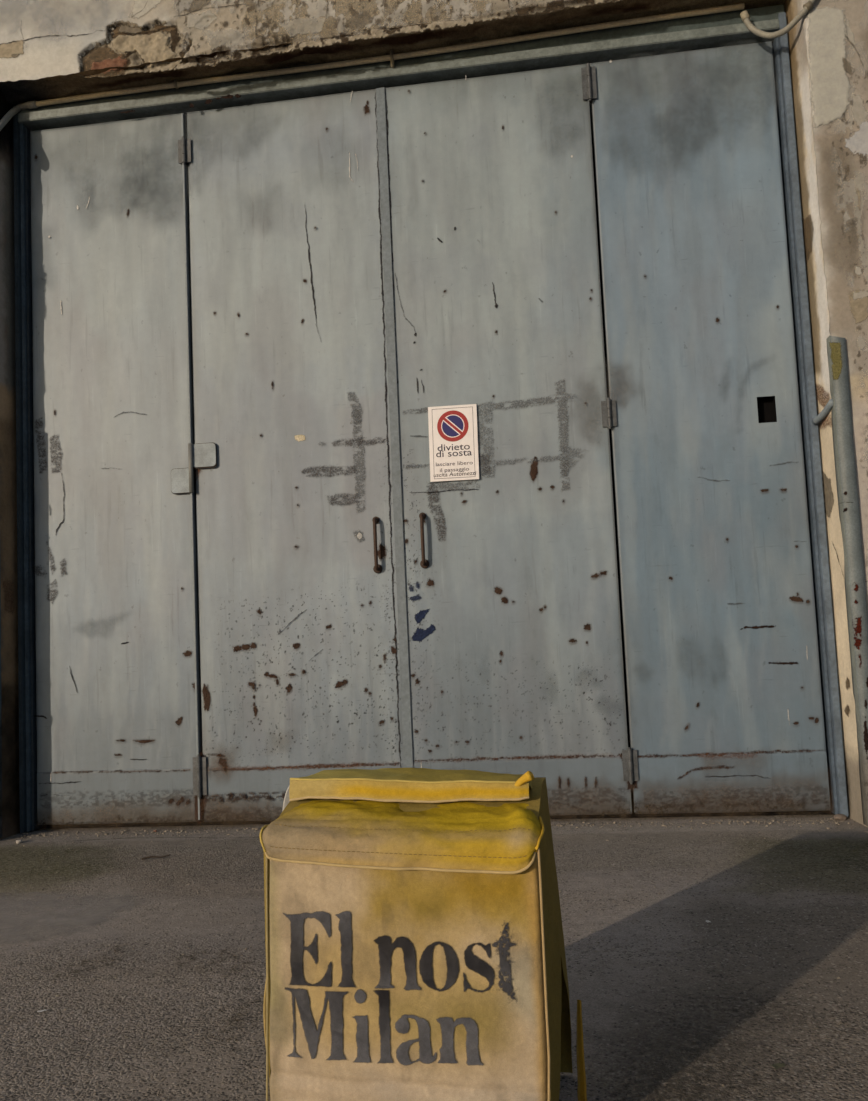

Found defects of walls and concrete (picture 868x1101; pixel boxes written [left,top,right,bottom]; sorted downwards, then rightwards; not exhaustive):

peeling [79,0,620,78]
corrosion [852,617,868,687]
corrosion [637,750,821,758]
corrosion [168,795,206,823]